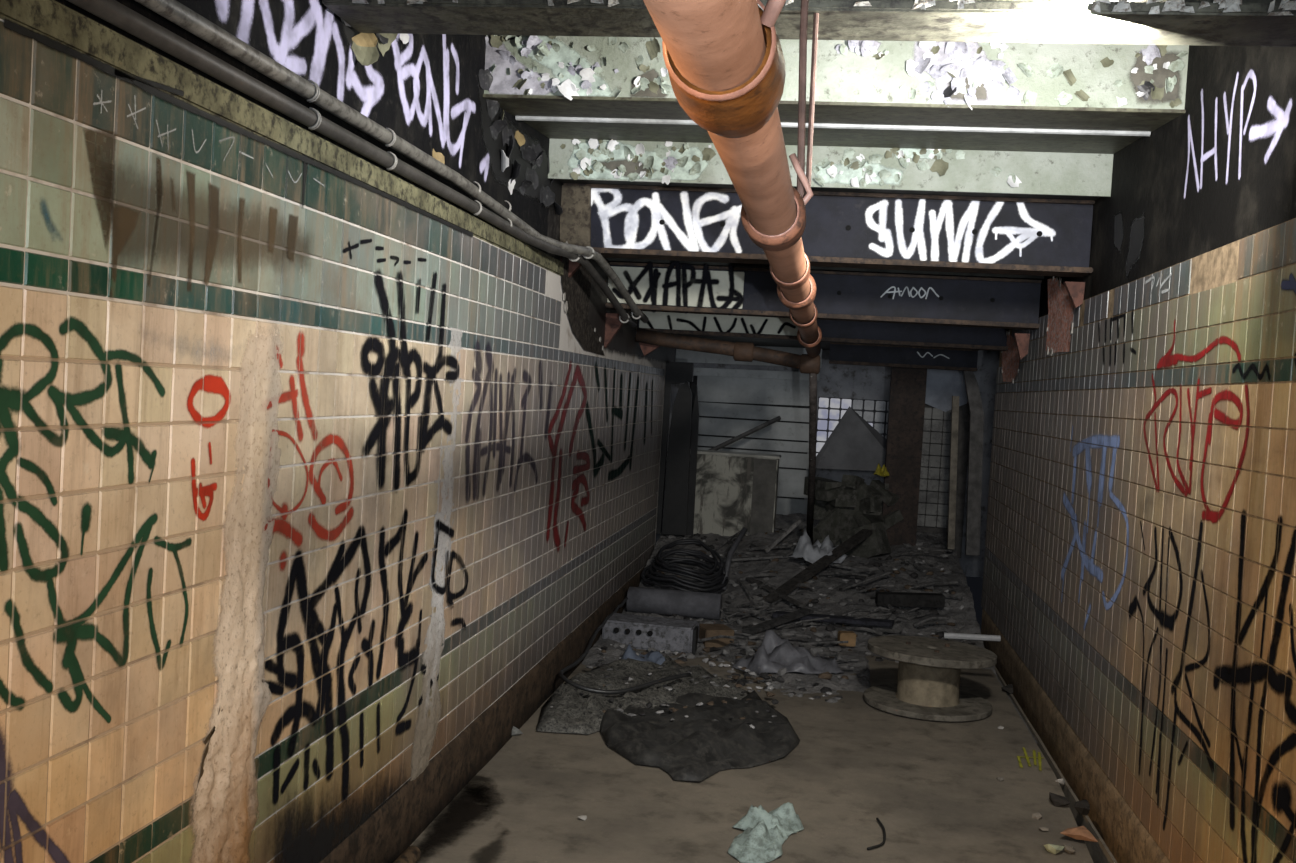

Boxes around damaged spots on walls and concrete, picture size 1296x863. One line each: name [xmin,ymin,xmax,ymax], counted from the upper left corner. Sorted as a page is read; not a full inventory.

peeling [835,40,889,60]
peeling [900,41,1090,110]
peeling [1114,45,1187,108]
peeling [478,35,716,215]
peeling [805,148,965,187]
peeling [990,167,1022,187]
damp [410,325,464,781]
damp [190,335,282,863]
damp [417,776,500,861]
damp [476,833,505,863]